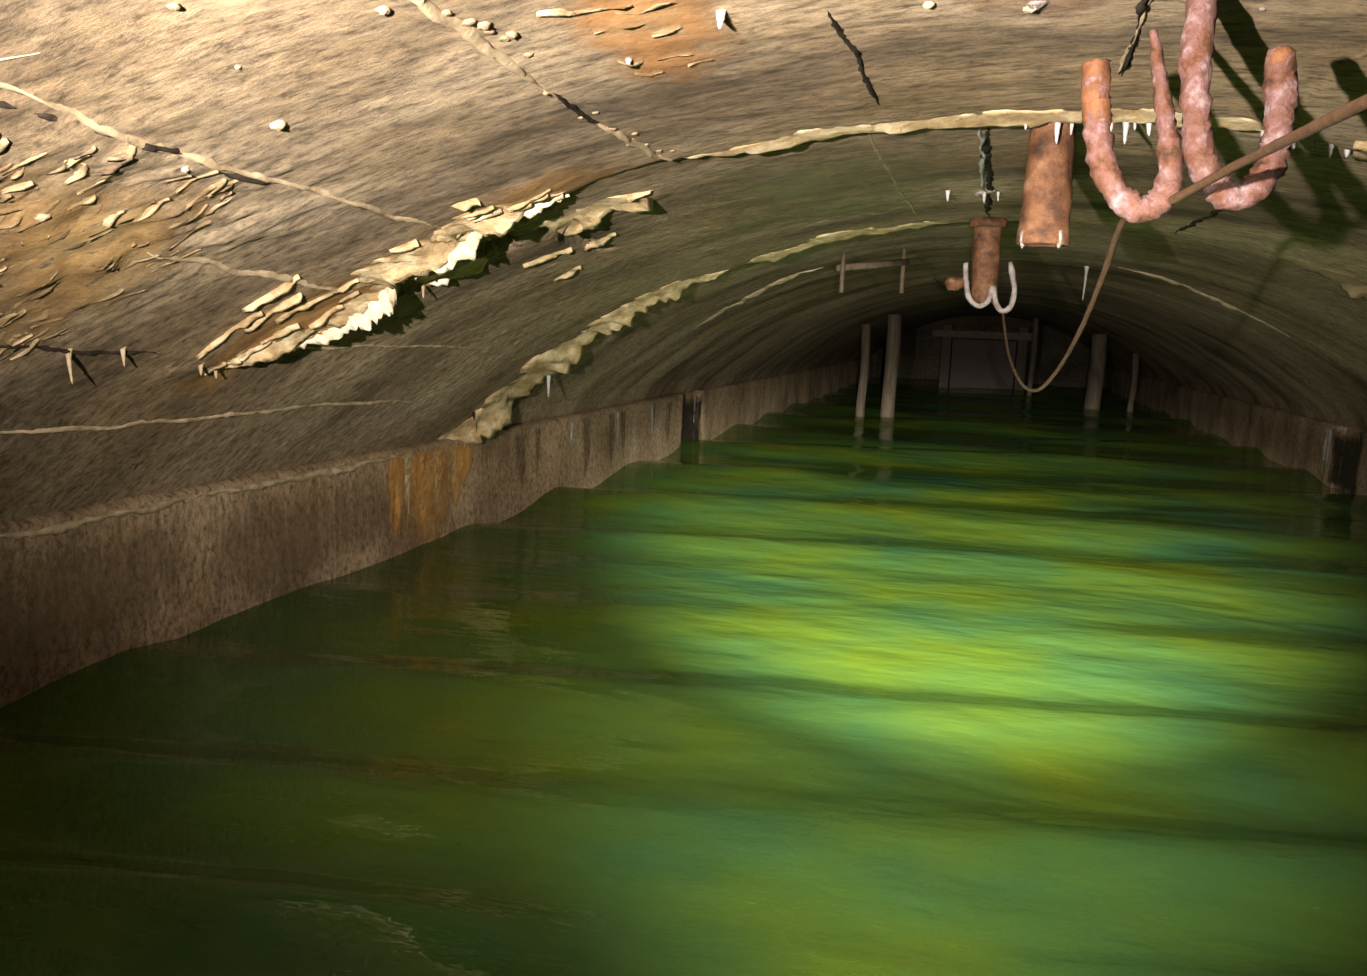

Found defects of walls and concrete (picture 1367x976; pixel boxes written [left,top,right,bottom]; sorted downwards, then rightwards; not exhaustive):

peeling [0,272,76,360]
peeling [0,138,242,307]
crack [0,52,442,230]
spalling [196,189,656,379]
crack [407,0,676,162]
crack [828,12,920,218]
corrosion [387,444,472,541]